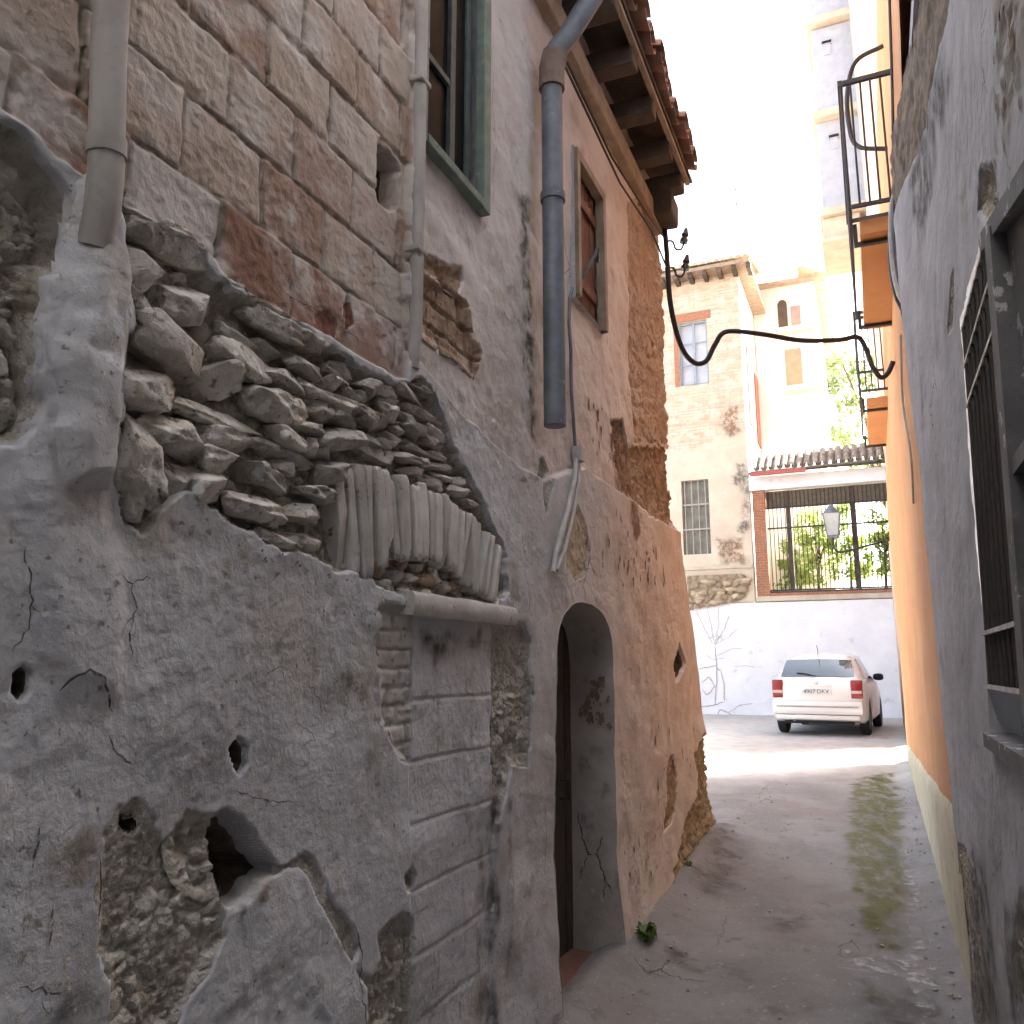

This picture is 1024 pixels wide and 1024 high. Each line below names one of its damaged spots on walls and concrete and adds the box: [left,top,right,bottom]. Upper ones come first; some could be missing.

flaking render [588,199,673,526]
crack [12,547,41,652]
crack [60,668,113,712]
crack [122,575,151,654]
flaking render [113,211,504,769]
flaking render [489,623,532,822]
flaking render [563,506,589,582]
flaking render [93,798,224,1024]
flaking render [213,950,340,1024]
flaking render [272,854,413,1024]
crack [576,810,640,898]
flaking render [624,723,716,878]